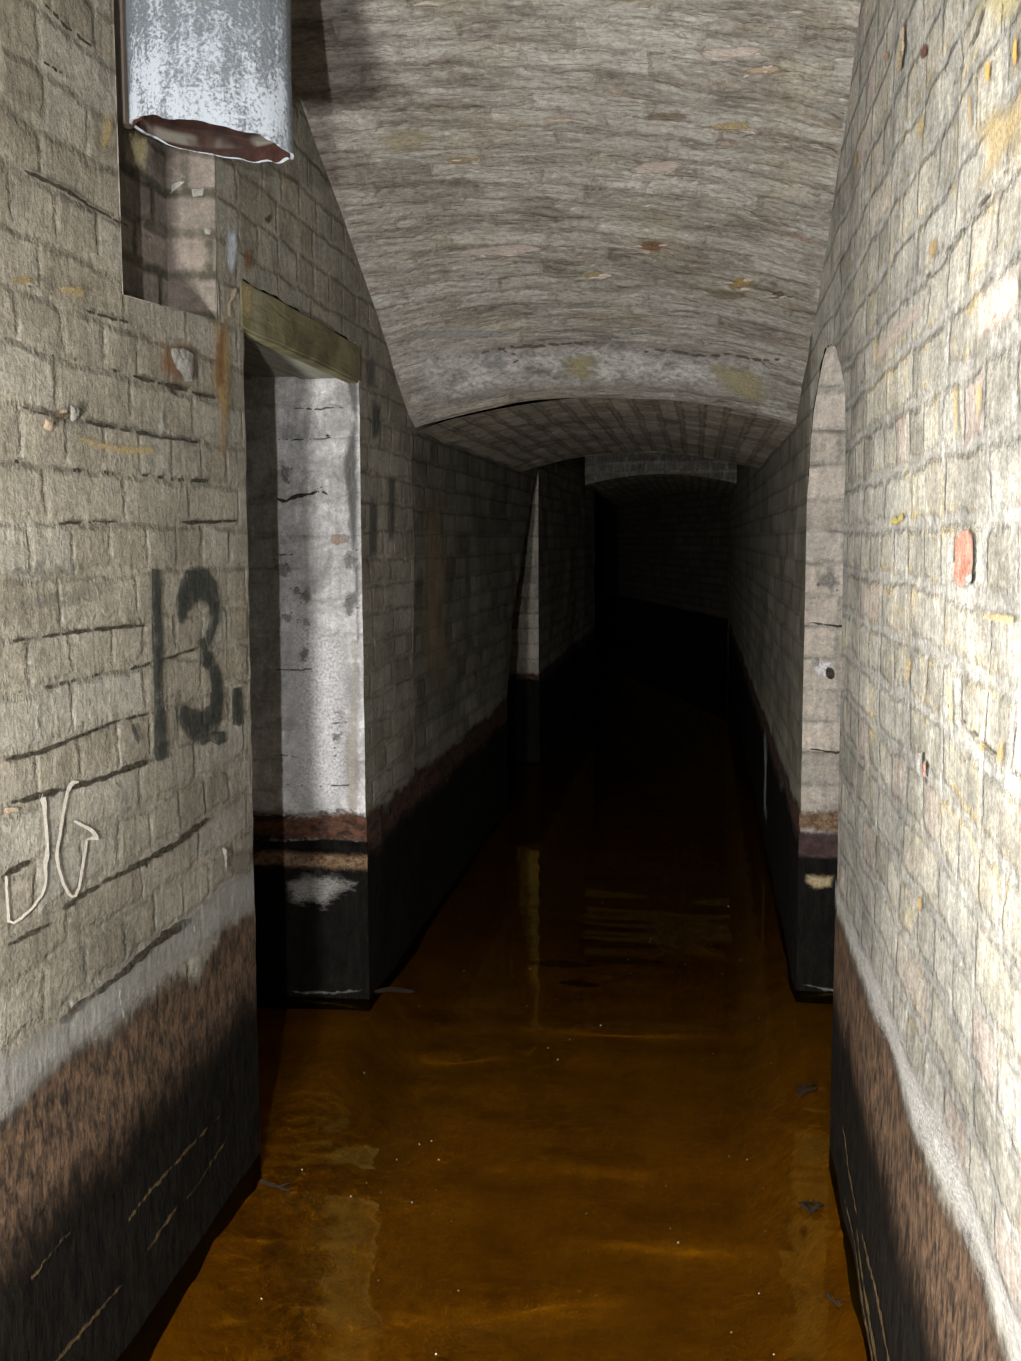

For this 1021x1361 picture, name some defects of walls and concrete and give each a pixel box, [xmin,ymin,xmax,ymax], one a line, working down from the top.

damp [274,559,310,627]
crack [812,621,842,629]
damp [817,573,839,591]
damp [0,591,1021,1361]